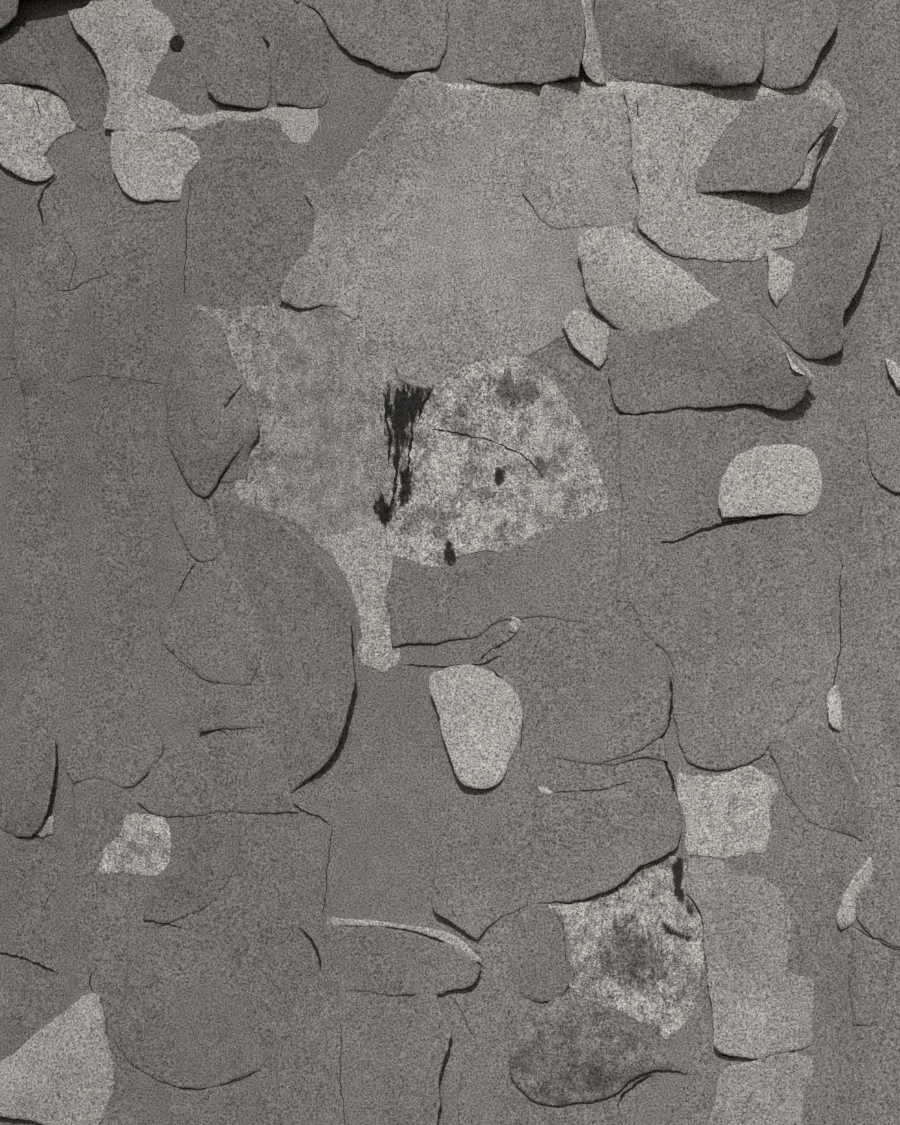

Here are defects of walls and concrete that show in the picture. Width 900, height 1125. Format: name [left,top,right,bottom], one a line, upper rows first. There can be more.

peeling [0,266,15,382]
peeling [166,0,883,1125]
peeling [0,706,164,839]
peeling [98,813,172,877]
crack [0,952,58,974]
peeling [0,917,272,1125]